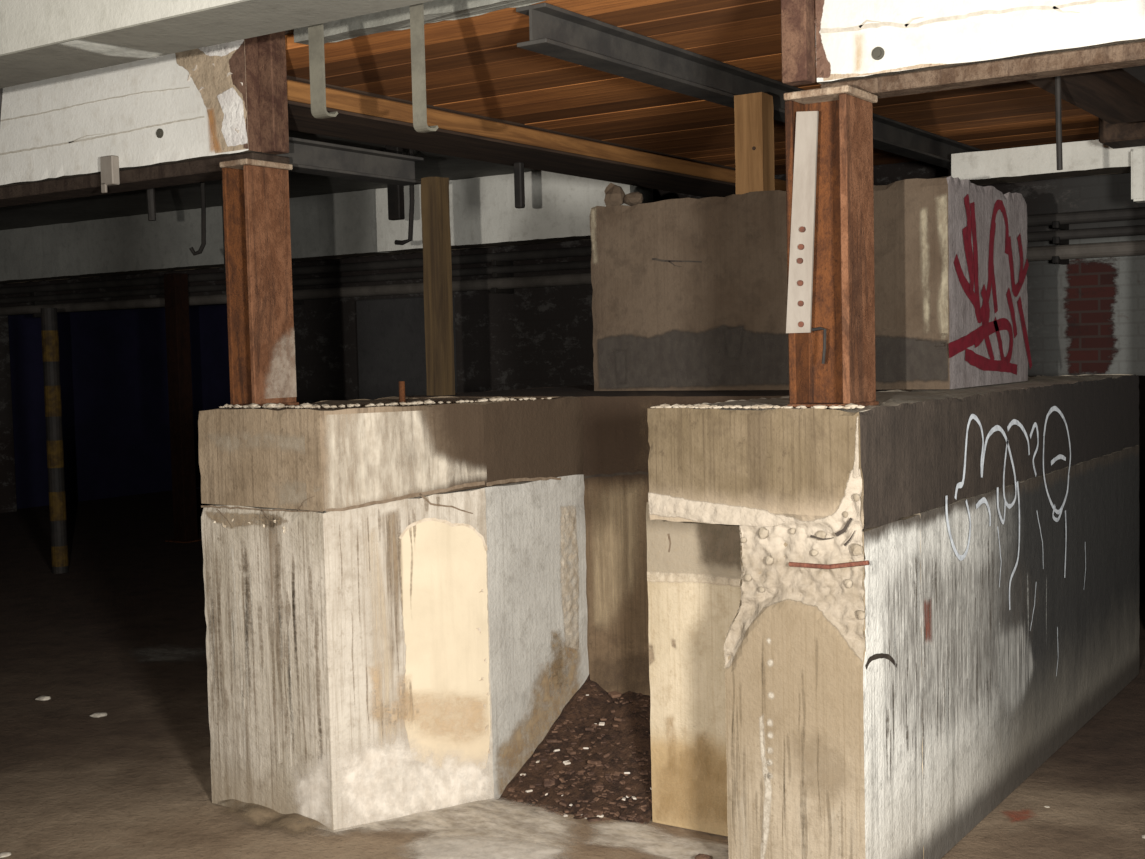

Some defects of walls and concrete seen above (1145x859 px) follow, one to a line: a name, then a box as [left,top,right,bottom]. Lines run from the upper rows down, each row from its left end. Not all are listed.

peeling [175,39,248,153]
spalling [814,0,945,81]
crack [820,0,1125,33]
damp [598,325,789,389]
damp [875,196,948,383]
peeling [1064,258,1118,375]
damp [231,548,253,749]
damp [266,519,312,767]
damp [375,513,400,745]
spalling [648,417,870,668]